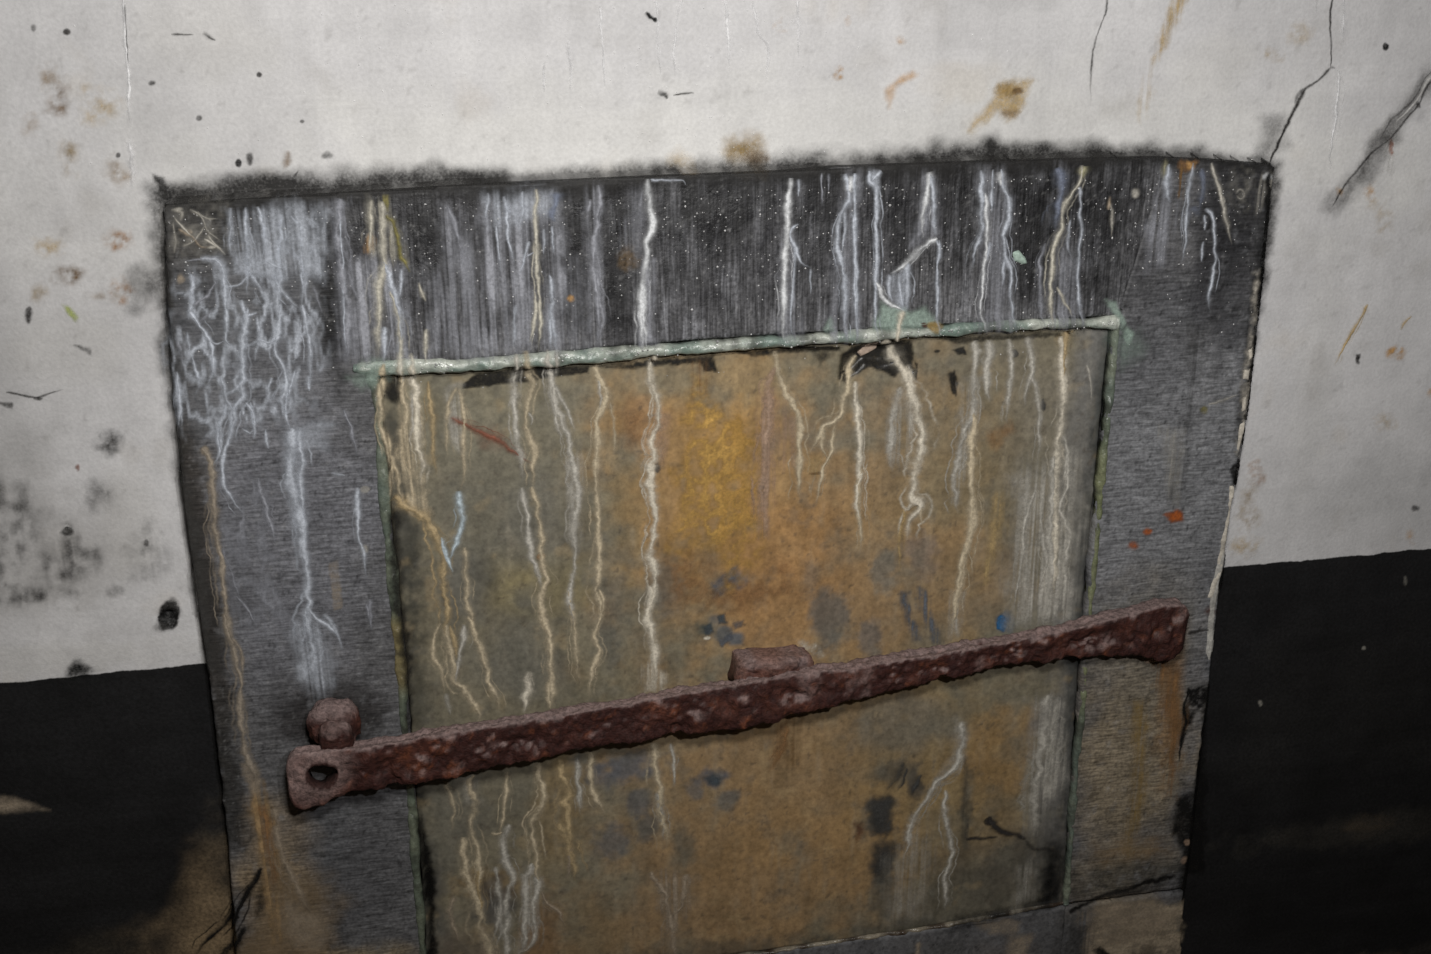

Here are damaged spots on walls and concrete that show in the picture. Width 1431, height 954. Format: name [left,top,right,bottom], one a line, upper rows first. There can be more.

corrosion [979,82,1026,121]
crack [1335,76,1431,202]
crack [1231,0,1333,485]
water stain [147,140,1279,792]
crack [1189,553,1226,634]
corrosion [251,792,318,942]
water stain [416,752,602,954]
water stain [646,743,675,835]
corrosion [286,597,1190,810]
water stain [906,722,966,900]
water stain [1030,695,1065,825]